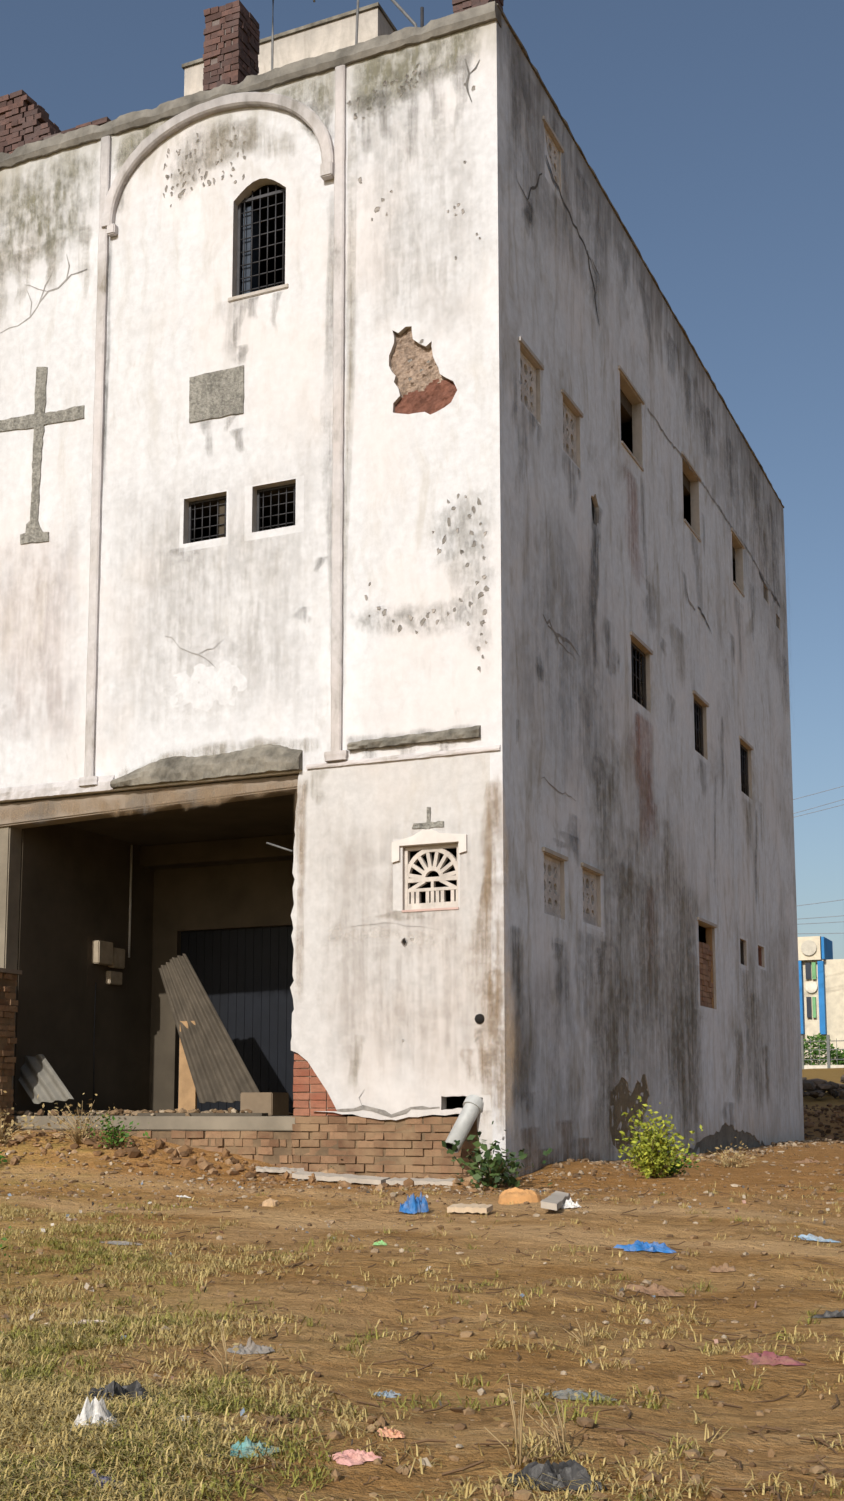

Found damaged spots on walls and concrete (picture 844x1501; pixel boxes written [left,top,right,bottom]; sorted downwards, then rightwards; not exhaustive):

damp [0,164,78,261]
crack [516,156,601,326]
crack [0,254,87,333]
spalling [391,328,457,415]
damp [484,794,498,907]
flaking render [293,1051,347,1116]
spalling [609,1074,649,1153]
spalling [687,1123,764,1155]